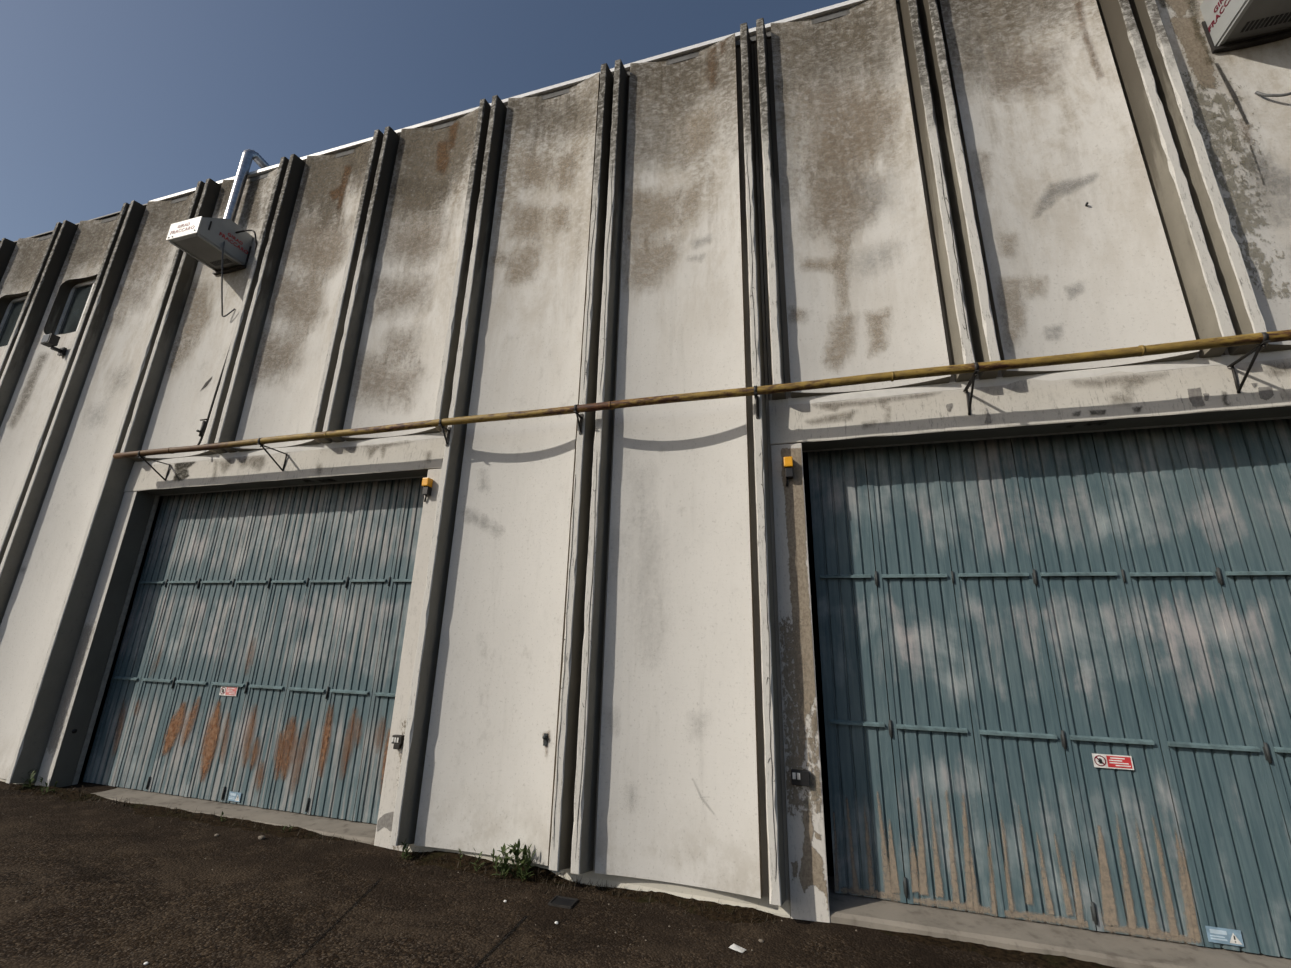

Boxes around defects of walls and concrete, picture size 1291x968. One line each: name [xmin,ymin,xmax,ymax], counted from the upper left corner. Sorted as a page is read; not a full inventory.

damp [289,140,373,270]
damp [391,110,479,254]
damp [806,87,891,282]
peeling [1164,0,1291,304]
corrosion [163,698,228,779]
corrosion [244,710,358,786]
corrosion [377,730,390,785]
peeling [779,448,1201,943]